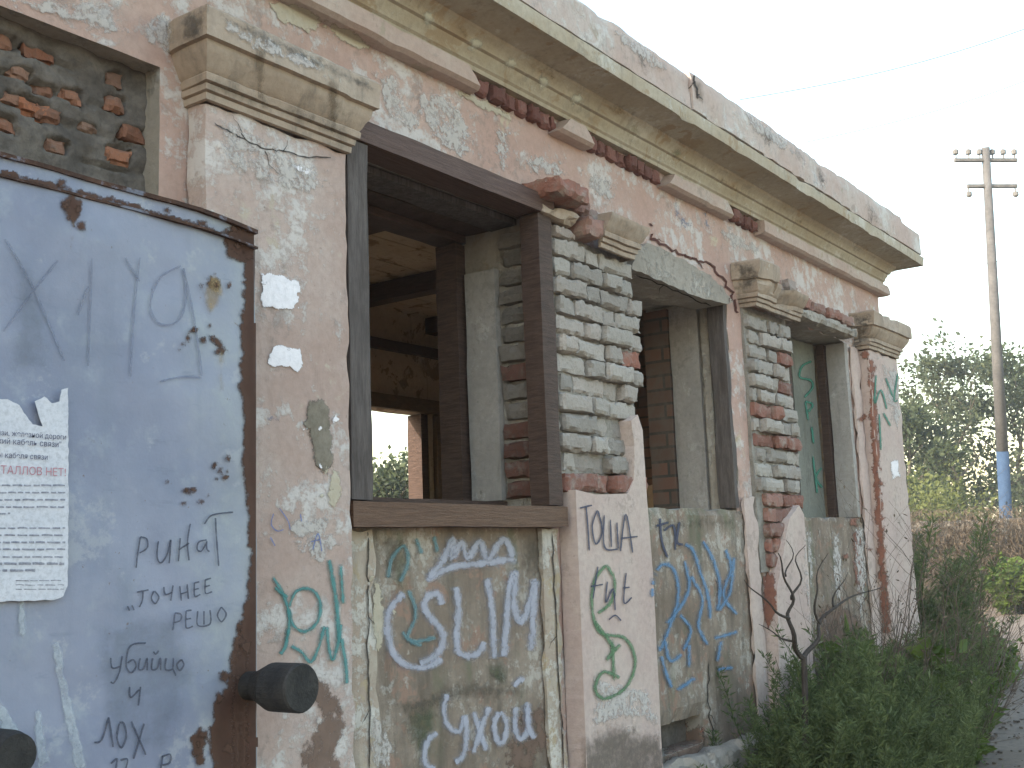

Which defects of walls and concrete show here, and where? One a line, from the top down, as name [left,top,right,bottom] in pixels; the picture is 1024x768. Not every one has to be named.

crack [215,116,331,175]
spalling [375,72,556,170]
crack [636,275,711,306]
corrosion [1,170,258,768]
spalling [303,399,340,473]